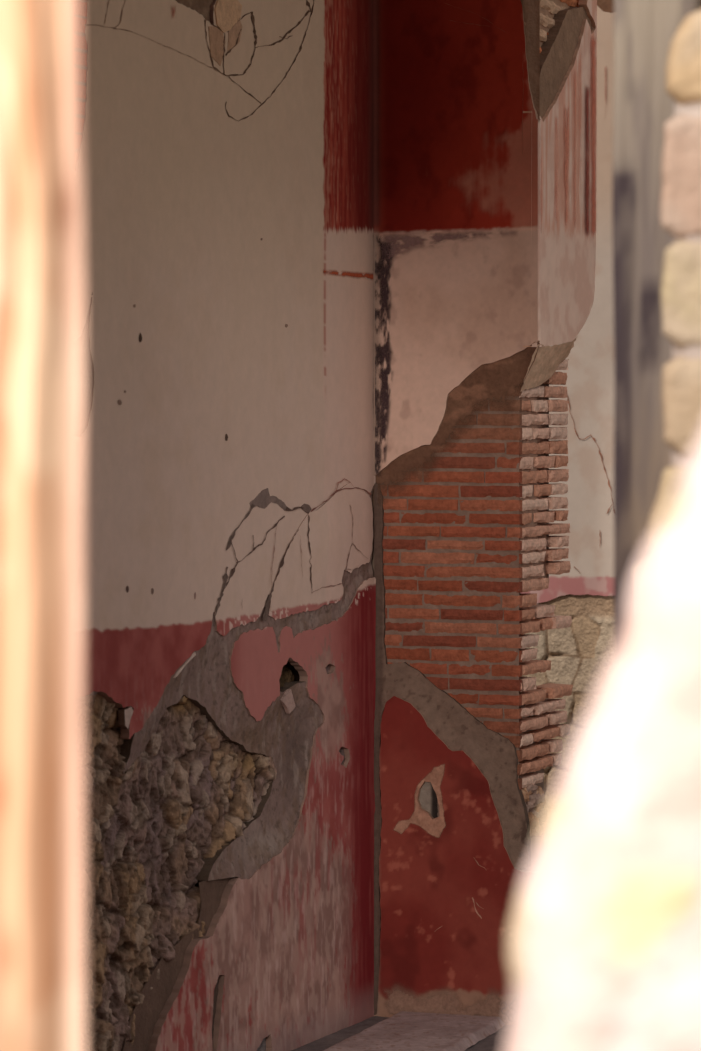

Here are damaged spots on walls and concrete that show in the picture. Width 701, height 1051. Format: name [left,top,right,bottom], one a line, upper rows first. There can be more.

crack [85,0,314,121]
flaking render [176,0,242,66]
flaking render [521,0,592,120]
flaking render [597,0,614,13]
water stain [375,238,391,474]
crack [567,396,614,544]
crack [213,478,371,626]
flaking render [84,336,614,1051]